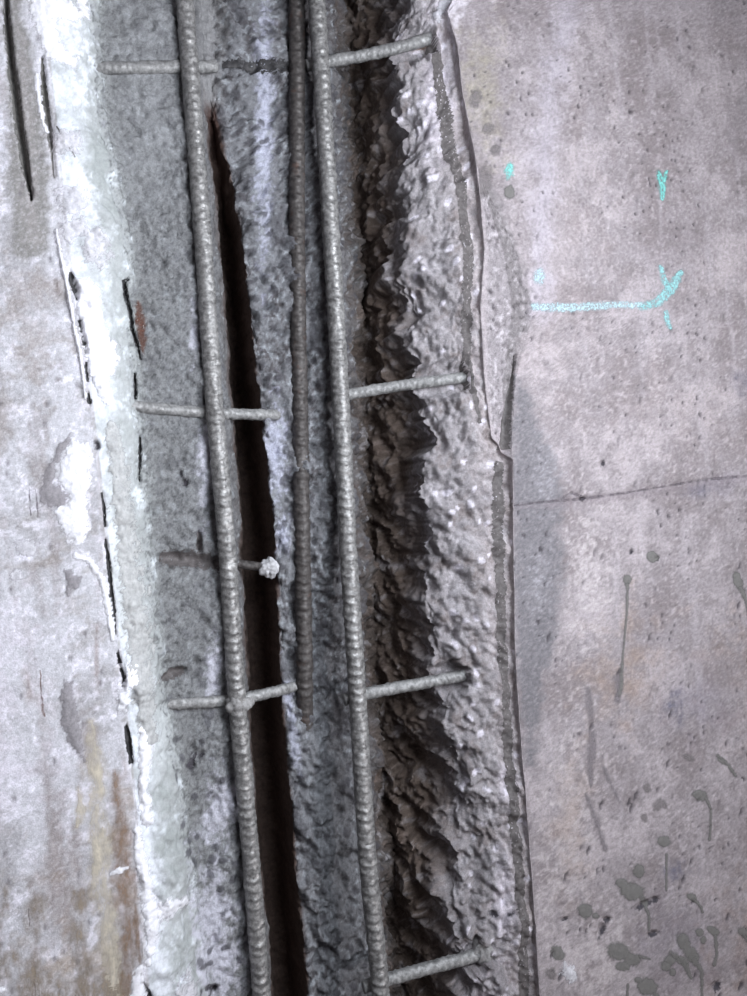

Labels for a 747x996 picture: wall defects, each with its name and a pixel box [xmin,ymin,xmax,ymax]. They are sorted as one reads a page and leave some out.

crack [3,0,75,201]
crack [69,272,92,404]
crack [122,278,142,399]
crack [101,492,126,687]
crack [136,437,144,482]
spalling [28,0,252,996]
spalling [193,0,372,996]
spalling [325,0,541,996]
crack [425,33,737,996]
crack [124,725,134,764]
damp [585,732,617,851]
peeling [559,962,577,984]